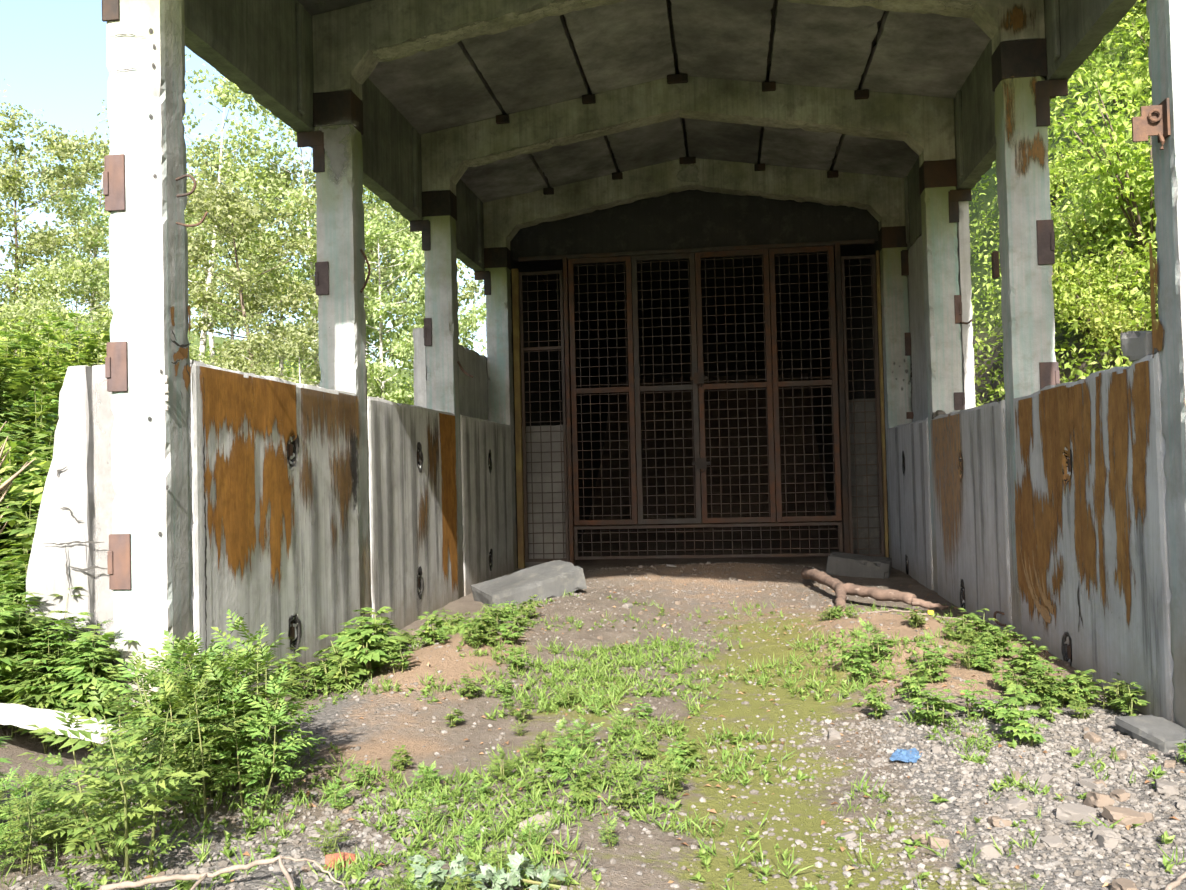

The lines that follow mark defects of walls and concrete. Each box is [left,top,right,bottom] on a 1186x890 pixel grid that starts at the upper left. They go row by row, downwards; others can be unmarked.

corrosion [1001,5,1036,34]
corrosion [1004,75,1046,175]
corrosion [199,366,360,591]
corrosion [417,413,458,597]
corrosion [931,414,963,568]
corrosion [1015,241,1165,631]